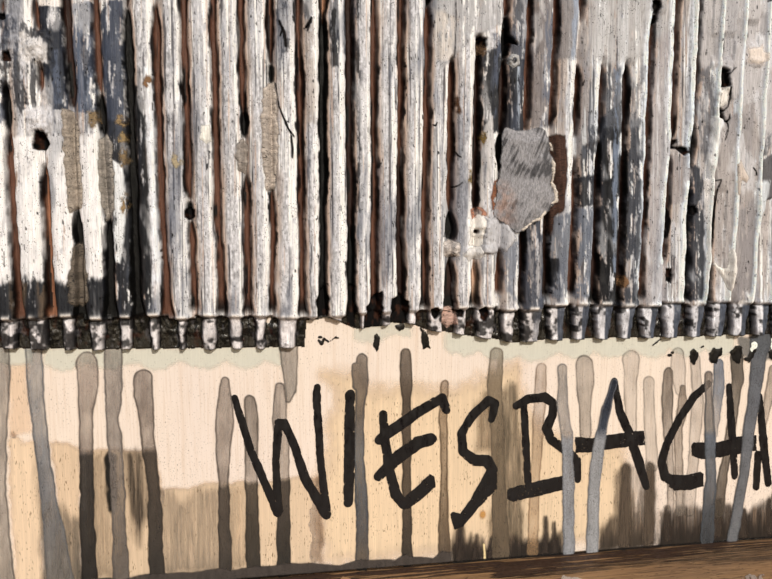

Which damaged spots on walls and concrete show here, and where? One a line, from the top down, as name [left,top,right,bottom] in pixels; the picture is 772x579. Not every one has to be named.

corrosion [116,115,130,167]
peeling [543,134,568,235]
corrosion [616,276,629,287]
damp [104,452,116,512]
damp [128,452,143,532]
damp [264,385,772,579]
damp [40,508,82,579]
damp [164,493,218,572]